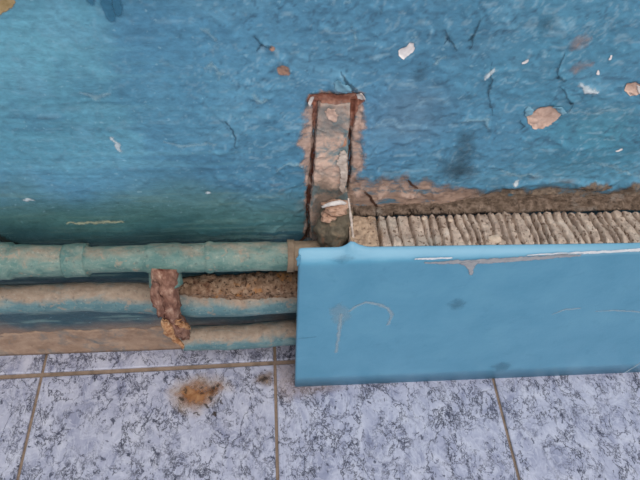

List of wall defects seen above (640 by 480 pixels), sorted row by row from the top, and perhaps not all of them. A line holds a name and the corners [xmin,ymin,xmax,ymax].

spalling [398,43,415,60]
rust [307,93,365,129]
peeling [298,80,640,241]
peeling [415,248,640,275]
rust [150,279,191,349]
rust [179,382,223,416]